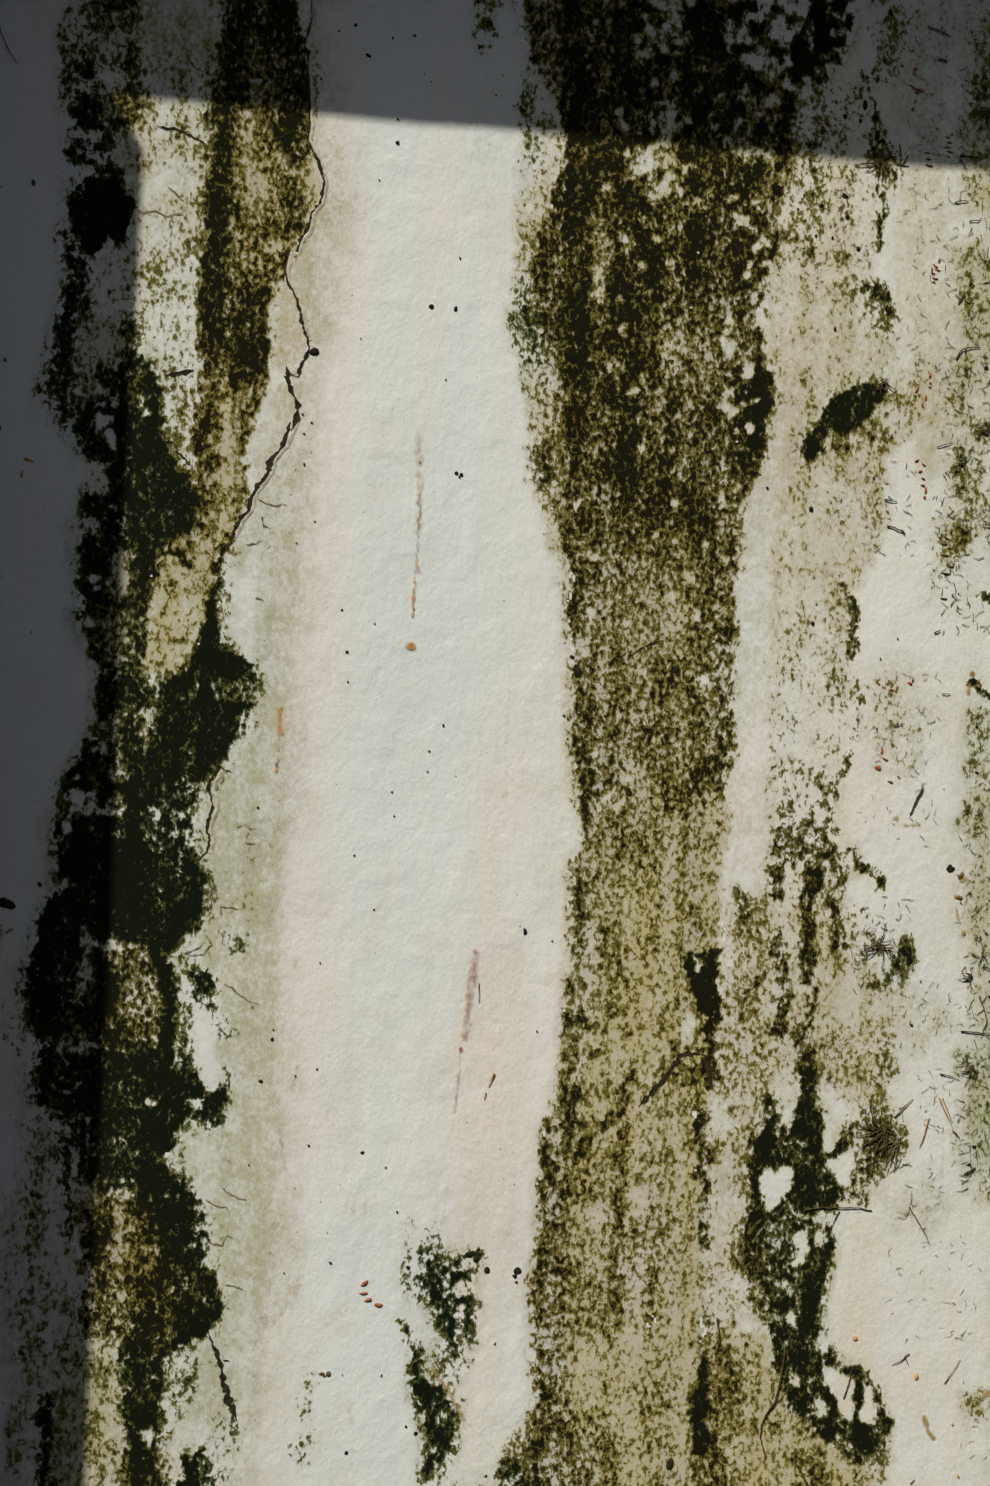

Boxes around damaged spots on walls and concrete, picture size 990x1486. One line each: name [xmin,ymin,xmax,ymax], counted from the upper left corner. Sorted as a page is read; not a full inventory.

crack [227,0,325,550]
water stain [0,0,323,1486]
water stain [471,0,921,1486]
water stain [946,864,964,900]
water stain [395,1211,496,1486]